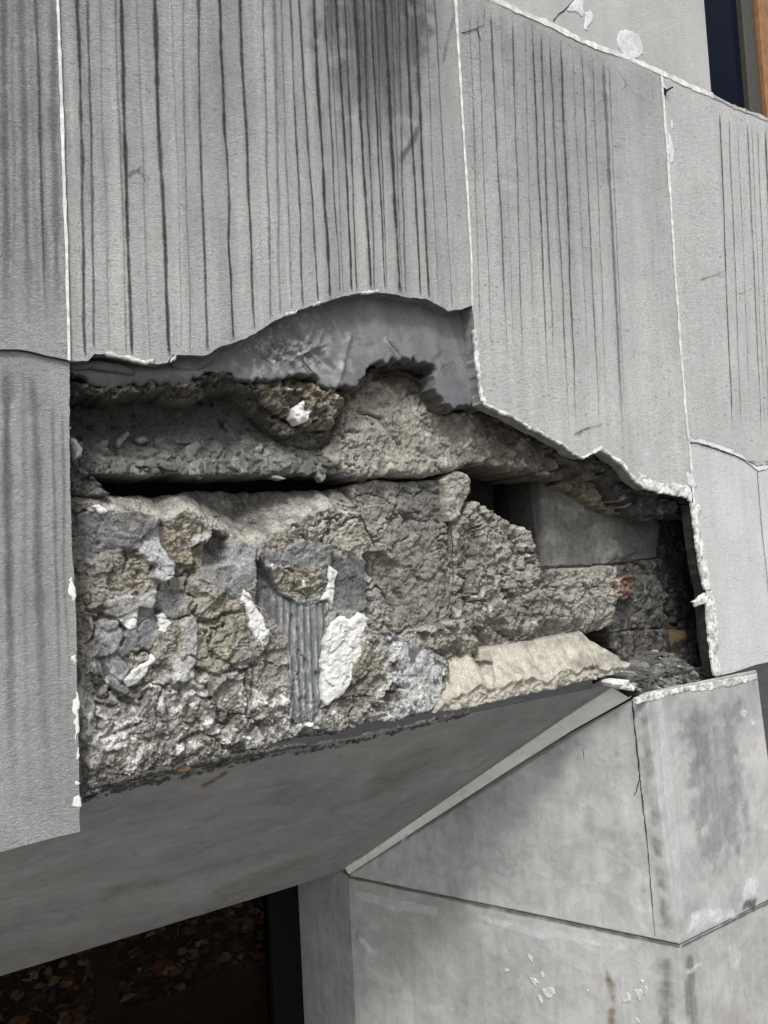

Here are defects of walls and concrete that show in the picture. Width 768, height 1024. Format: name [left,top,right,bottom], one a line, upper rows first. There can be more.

spalling [68,289,757,807]
crack [348,692,768,947]